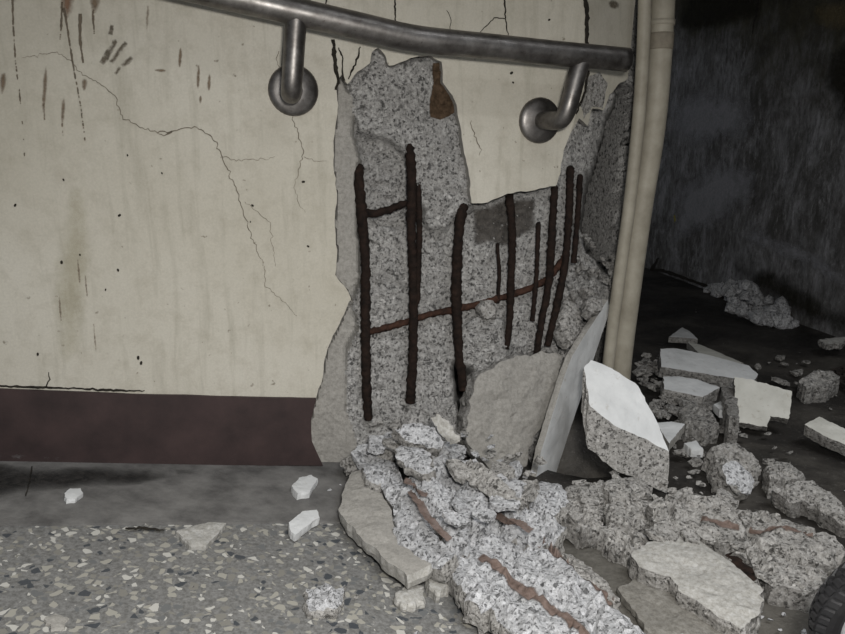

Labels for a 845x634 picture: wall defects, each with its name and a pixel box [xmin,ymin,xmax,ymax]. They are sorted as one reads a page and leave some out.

crack [480,0,509,35]
crack [582,0,590,44]
corrosion [430,63,454,120]
crack [576,70,590,114]
crack [22,52,297,316]
spalling [311,49,635,463]